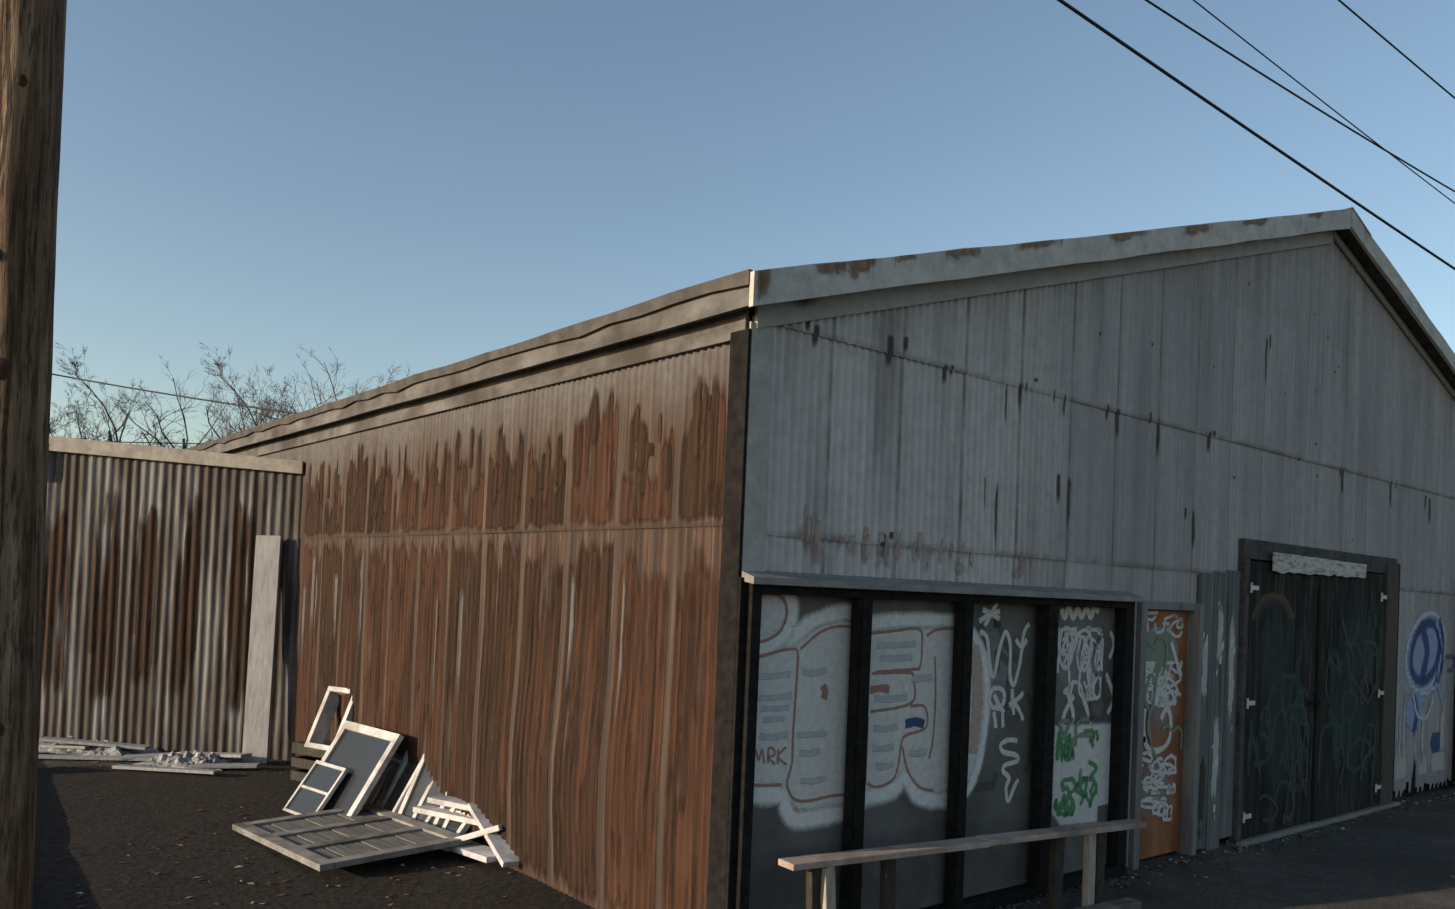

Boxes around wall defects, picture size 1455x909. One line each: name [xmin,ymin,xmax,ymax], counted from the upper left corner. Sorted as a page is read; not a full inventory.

rust [1242,218,1268,226]
rust [1187,224,1213,234]
rust [1112,231,1147,241]
rust [1021,239,1063,249]
rust [947,248,980,259]
rust [818,258,876,278]
rust [758,269,771,298]